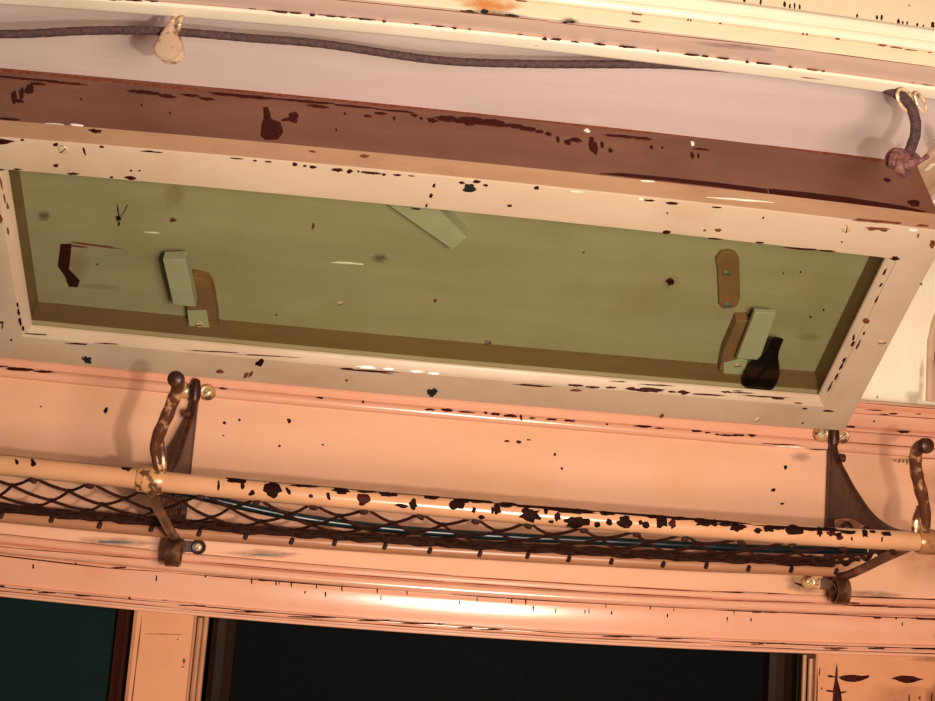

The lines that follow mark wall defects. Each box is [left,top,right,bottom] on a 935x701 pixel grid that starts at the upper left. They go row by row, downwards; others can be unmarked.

rust [460,0,520,17]
peeling [0,365,53,373]
peeling [424,408,535,421]
peeling [691,430,828,451]
peeling [0,454,132,472]
peeling [217,477,891,542]
spalling [847,602,935,620]